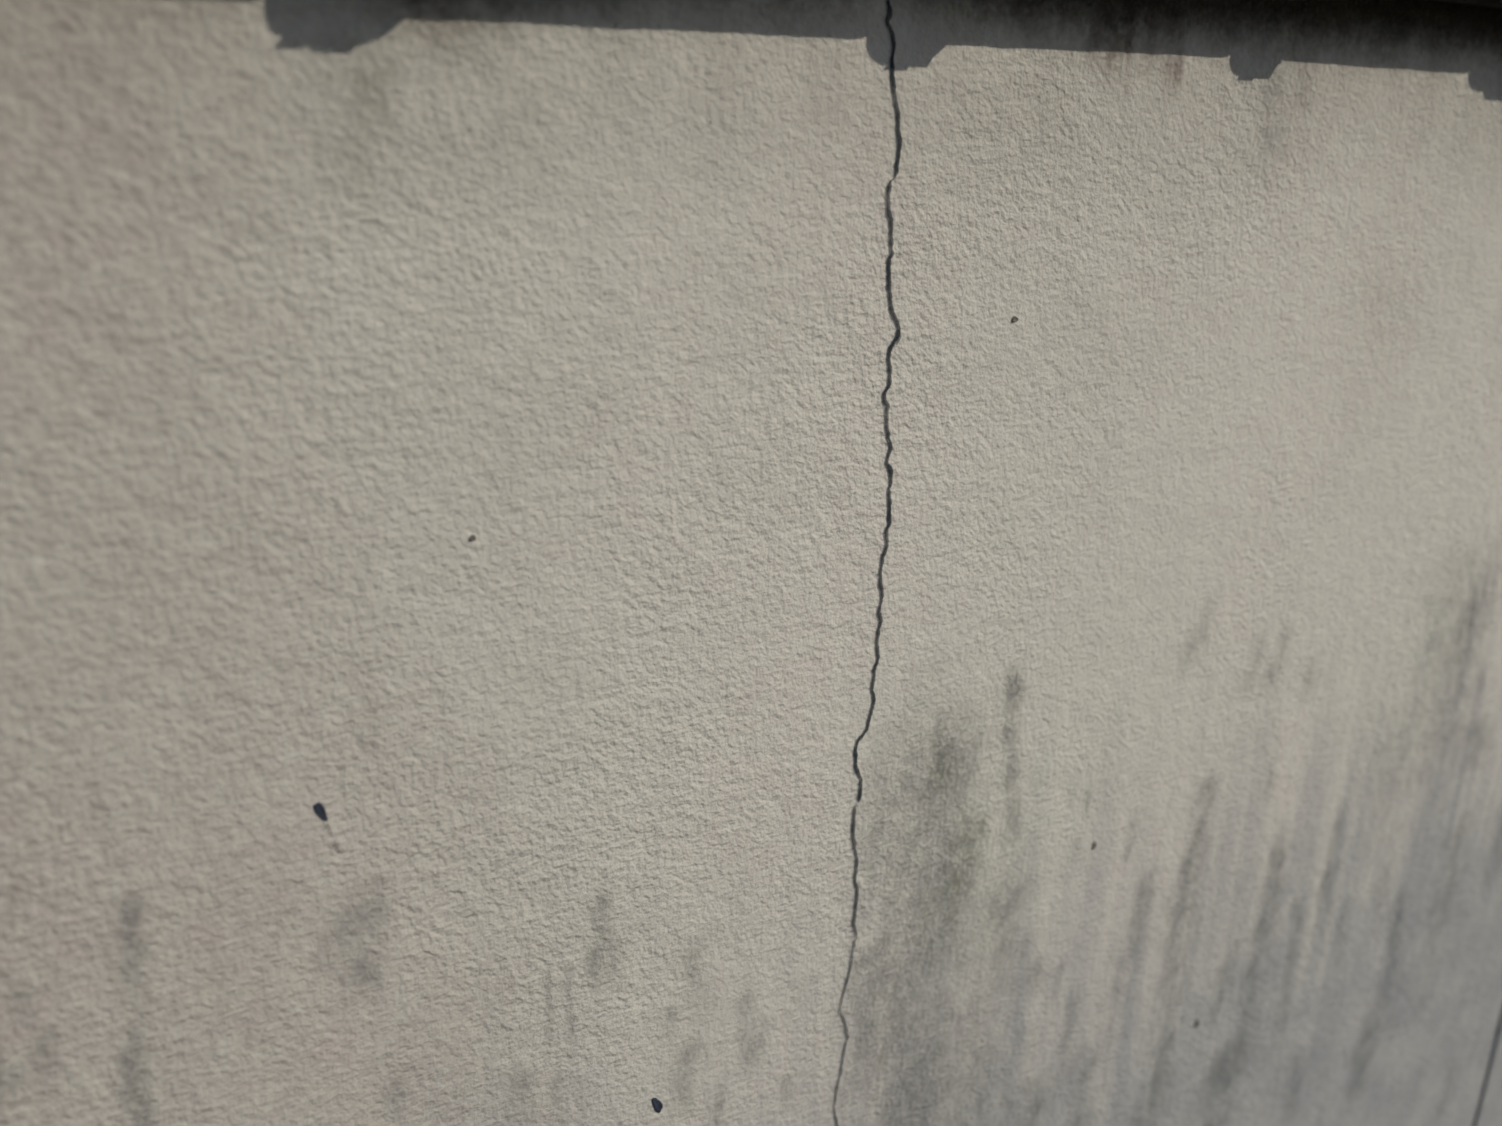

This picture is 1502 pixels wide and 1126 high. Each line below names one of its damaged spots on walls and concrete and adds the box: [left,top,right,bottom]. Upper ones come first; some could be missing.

crack [833,0,902,1126]